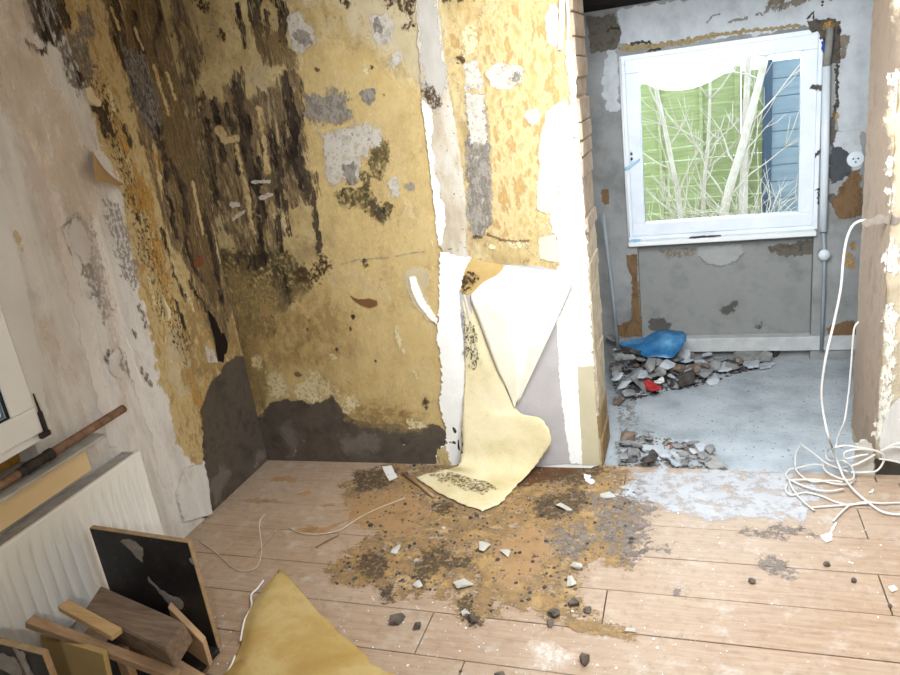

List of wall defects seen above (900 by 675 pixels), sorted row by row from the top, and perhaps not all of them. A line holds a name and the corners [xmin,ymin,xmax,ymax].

leakage [0,0,496,512]
spalling [317,120,384,191]
spalling [359,88,376,106]
spalling [456,22,523,239]
peeling [470,3,600,468]
spalling [659,243,745,268]
spalling [586,0,850,64]
spalling [833,0,900,470]